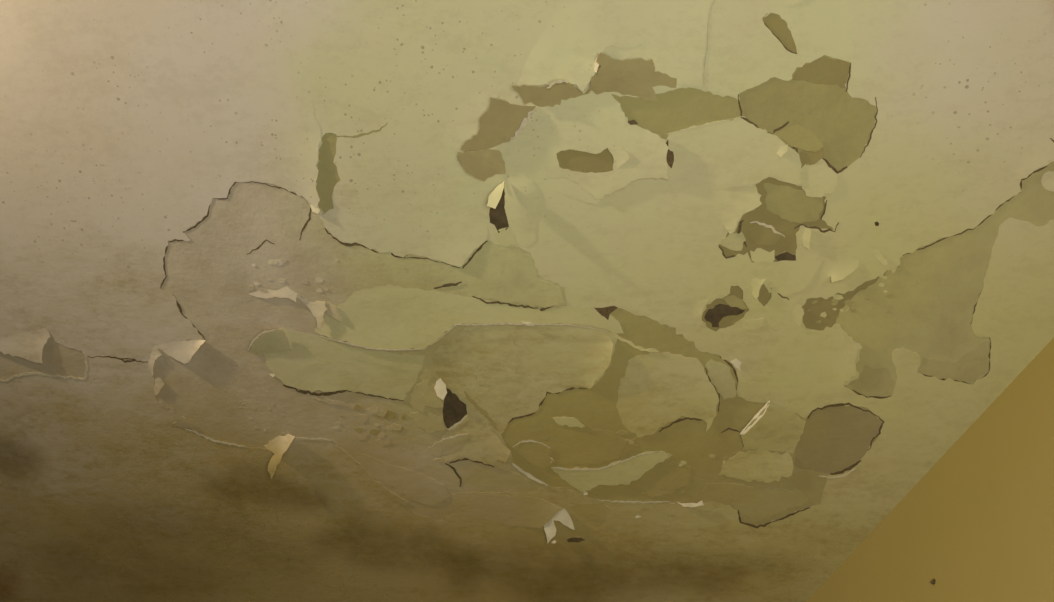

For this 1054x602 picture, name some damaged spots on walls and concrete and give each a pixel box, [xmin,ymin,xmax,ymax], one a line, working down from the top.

flaking render [148,13,1054,544]
peeling [0,328,88,382]
crack [88,355,142,363]